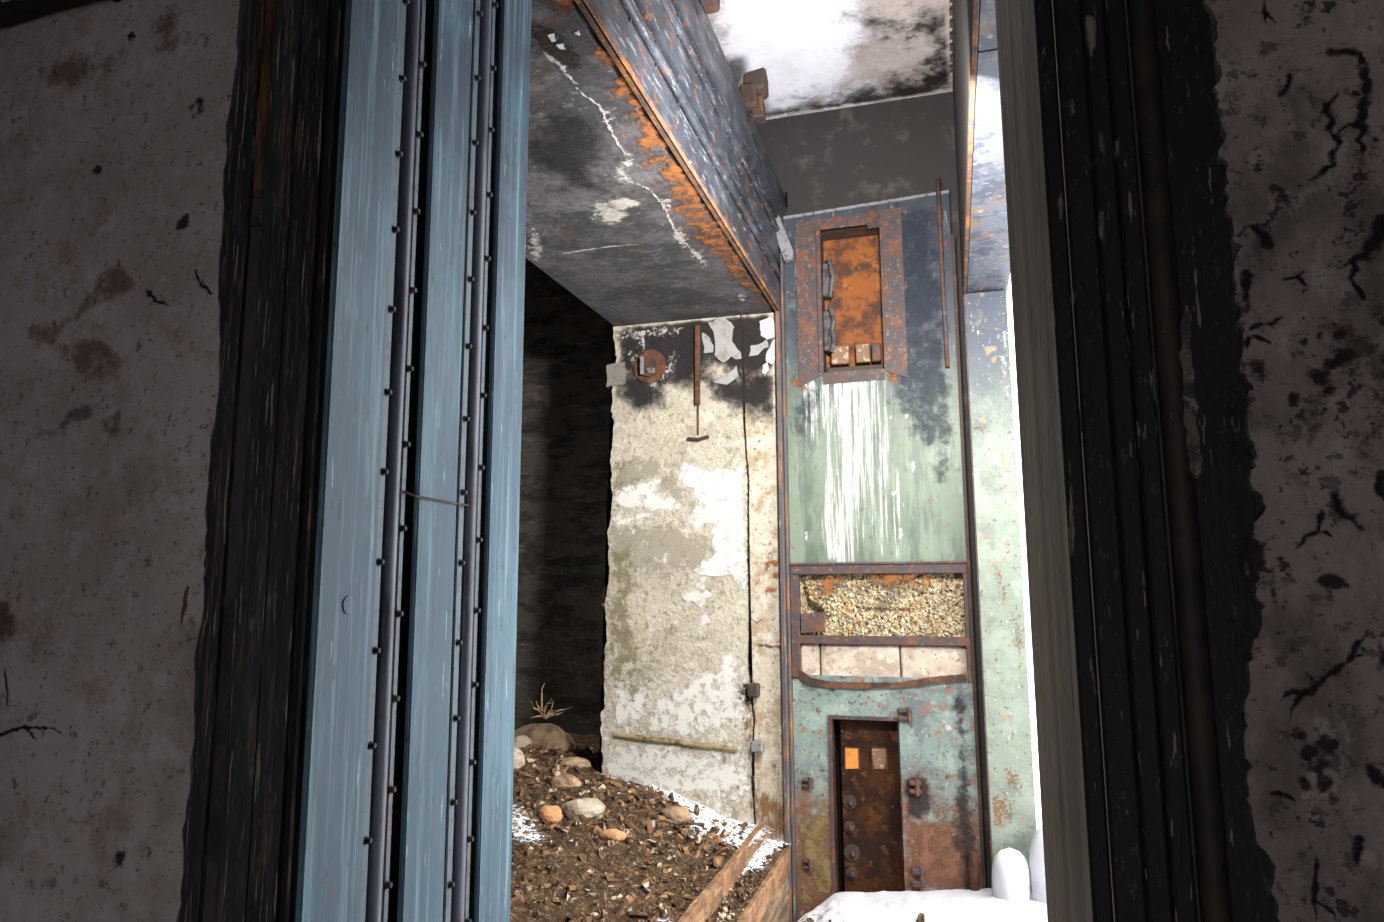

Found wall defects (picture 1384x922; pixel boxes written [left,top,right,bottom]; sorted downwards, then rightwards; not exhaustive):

crack [1309,48,1380,180]
peeling [590,153,639,225]
corrosion [590,43,773,305]
peeling [673,227,707,266]
crack [1240,224,1307,350]
crack [1343,214,1384,301]
peeling [702,316,776,385]
peeling [610,457,747,626]
crack [1296,470,1384,549]
spalling [603,647,751,803]
crack [1284,632,1369,713]
corrosion [902,785,969,891]